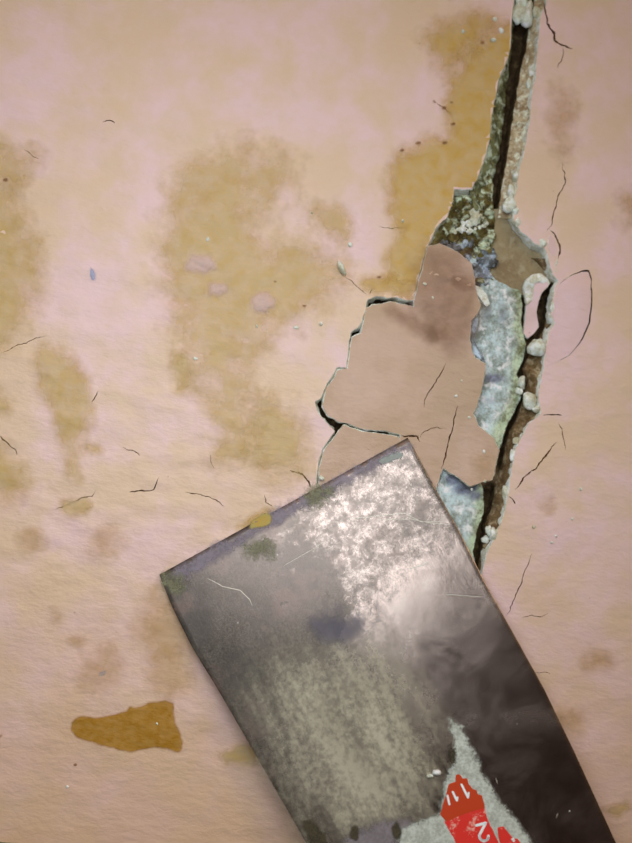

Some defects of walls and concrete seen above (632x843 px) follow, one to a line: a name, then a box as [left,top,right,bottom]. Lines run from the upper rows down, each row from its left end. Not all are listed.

damp [0,194,36,341]
damp [39,350,89,442]
damp [164,160,326,465]
crack [316,400,398,438]
crack [340,273,413,307]
damp [363,15,510,292]
peeling [315,40,592,575]
crack [473,163,566,570]
crack [469,0,572,229]
damp [71,701,182,752]